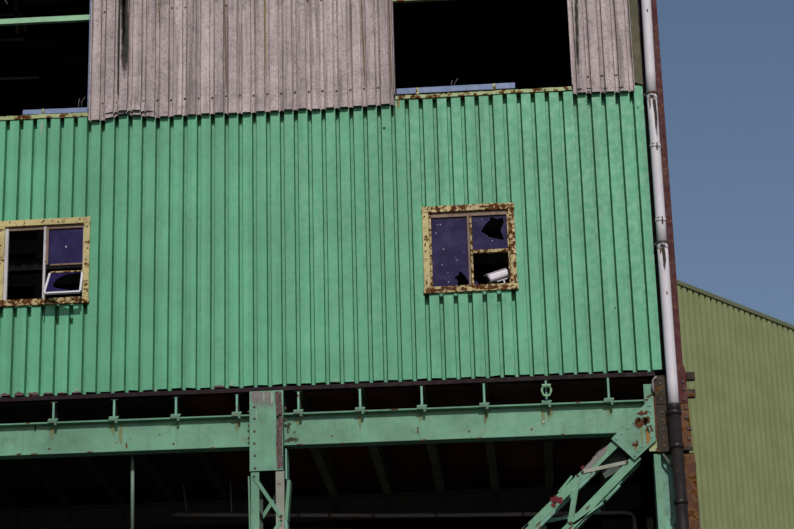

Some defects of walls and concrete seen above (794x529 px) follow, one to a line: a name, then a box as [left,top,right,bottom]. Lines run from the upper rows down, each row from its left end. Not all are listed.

damp [117,0,129,94]
rust [632,394,657,450]